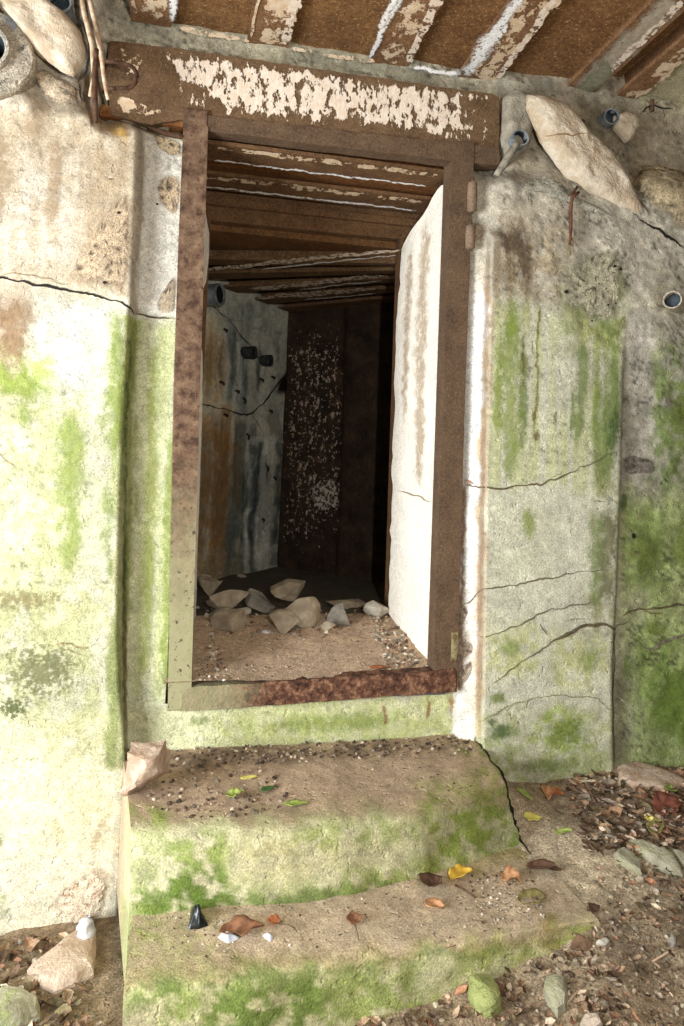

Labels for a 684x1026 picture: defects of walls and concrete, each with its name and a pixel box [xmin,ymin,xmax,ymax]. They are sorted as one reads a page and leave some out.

peeling [250,0,302,45]
peeling [381,0,444,64]
peeling [473,0,562,80]
peeling [166,52,488,141]
crack [633,199,684,248]
water stain [0,306,30,356]
crack [0,272,170,319]
water stain [494,314,515,428]
water stain [59,419,81,562]
crack [466,450,616,490]
water stain [101,358,132,729]
crack [474,603,684,854]